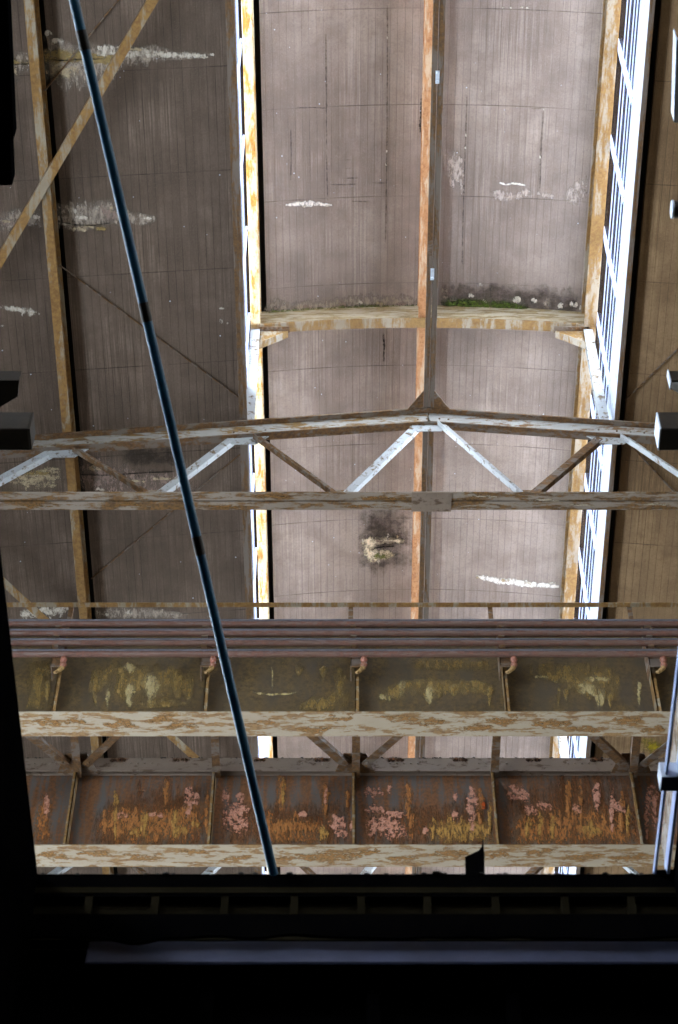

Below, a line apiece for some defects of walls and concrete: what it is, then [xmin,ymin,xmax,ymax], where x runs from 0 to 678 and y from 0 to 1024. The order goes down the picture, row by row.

water stain [44,30,214,90]
water stain [57,201,156,232]
water stain [285,200,332,208]
water stain [476,575,559,588]
peeling [103,714,199,730]
peeling [532,719,601,733]
corrosion [33,793,52,842]
corrosion [93,775,352,844]
corrosion [364,782,493,844]
corrosion [506,775,664,844]
peeling [37,850,162,862]
peeling [275,847,468,864]